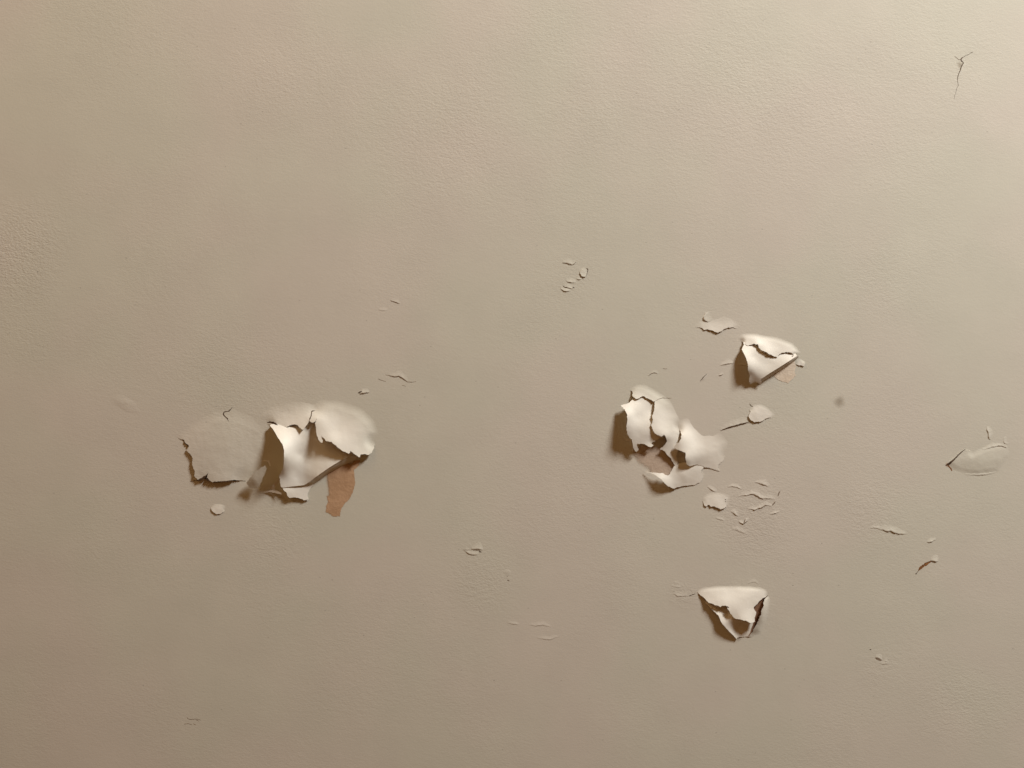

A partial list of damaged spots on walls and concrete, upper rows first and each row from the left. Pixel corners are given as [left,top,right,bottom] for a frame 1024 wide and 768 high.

crack [954,52,972,98]
peeling [695,311,805,385]
peeling [176,388,378,517]
peeling [621,384,775,489]
peeling [702,492,730,509]
peeling [690,578,770,639]